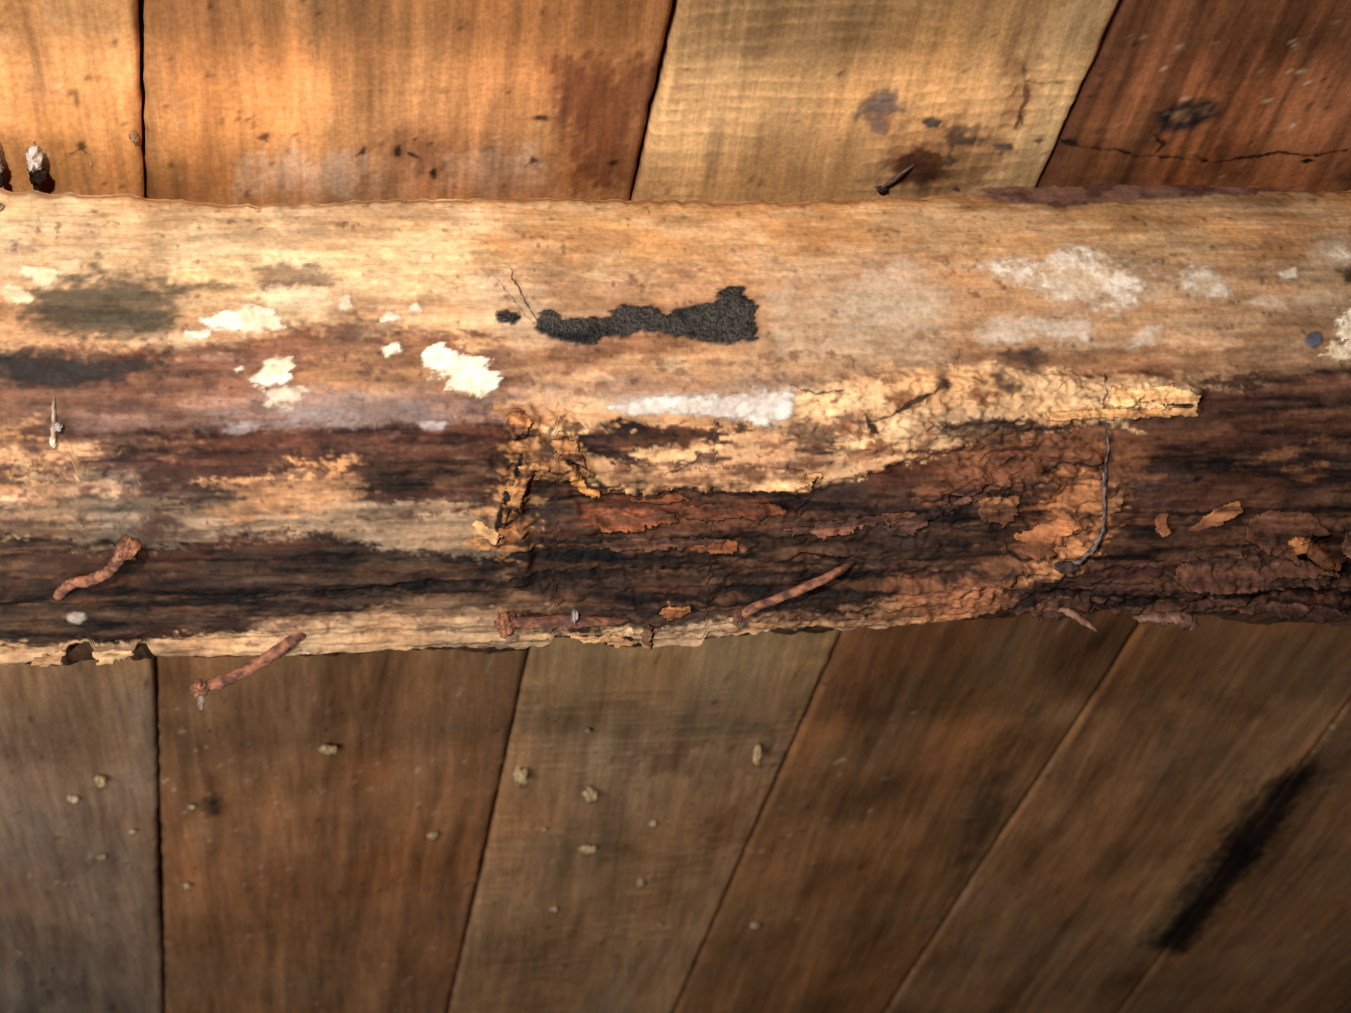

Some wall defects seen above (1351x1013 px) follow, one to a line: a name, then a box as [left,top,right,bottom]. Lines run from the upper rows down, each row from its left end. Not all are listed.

crack [1060,134,1347,163]
damp [979,246,1229,318]
damp [1279,267,1297,278]
damp [1325,245,1351,281]
damp [0,265,202,387]
damp [993,372,1020,393]
peeling [569,463,823,499]
peeling [1109,501,1351,632]
peeling [1029,594,1092,622]
corrosion [197,695,205,712]